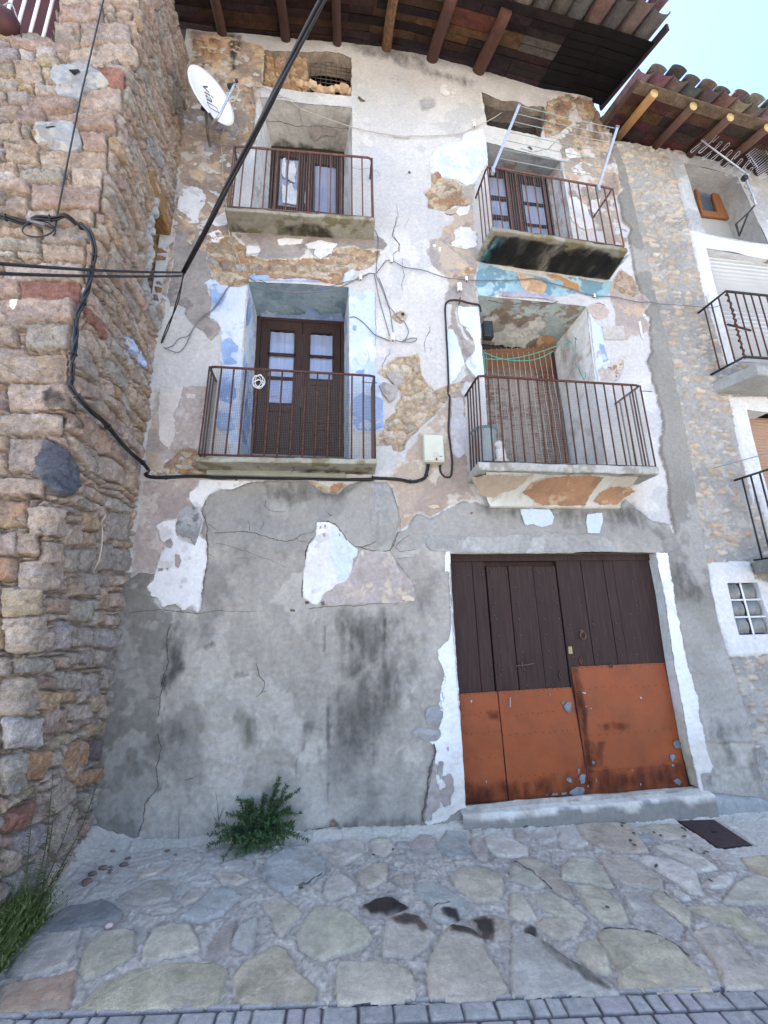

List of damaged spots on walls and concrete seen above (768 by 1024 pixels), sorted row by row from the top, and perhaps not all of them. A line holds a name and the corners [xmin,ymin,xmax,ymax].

peeling [131,31,651,612]
damp [163,648,182,687]
crack [113,482,415,835]
damp [343,620,385,738]
peeling [424,747,454,821]